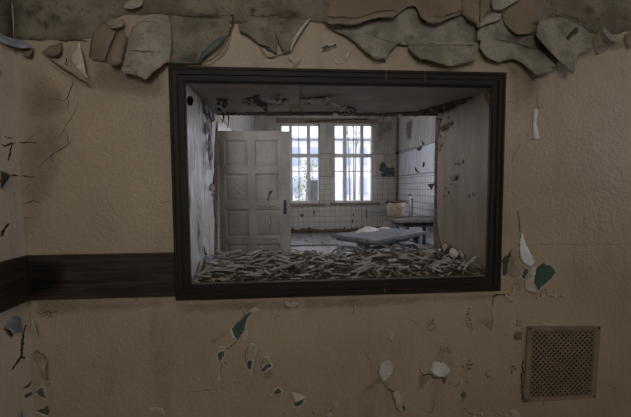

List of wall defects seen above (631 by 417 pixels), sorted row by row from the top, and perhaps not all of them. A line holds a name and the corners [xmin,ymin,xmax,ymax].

flaking render [0,0,631,87]
crack [2,72,78,186]
flaking render [196,94,477,280]
peeling [501,231,557,295]
peeling [4,315,22,337]
crack [12,325,26,370]
peeling [23,380,50,417]
peeling [217,306,273,388]
peeling [362,349,407,414]
peeling [419,361,451,383]